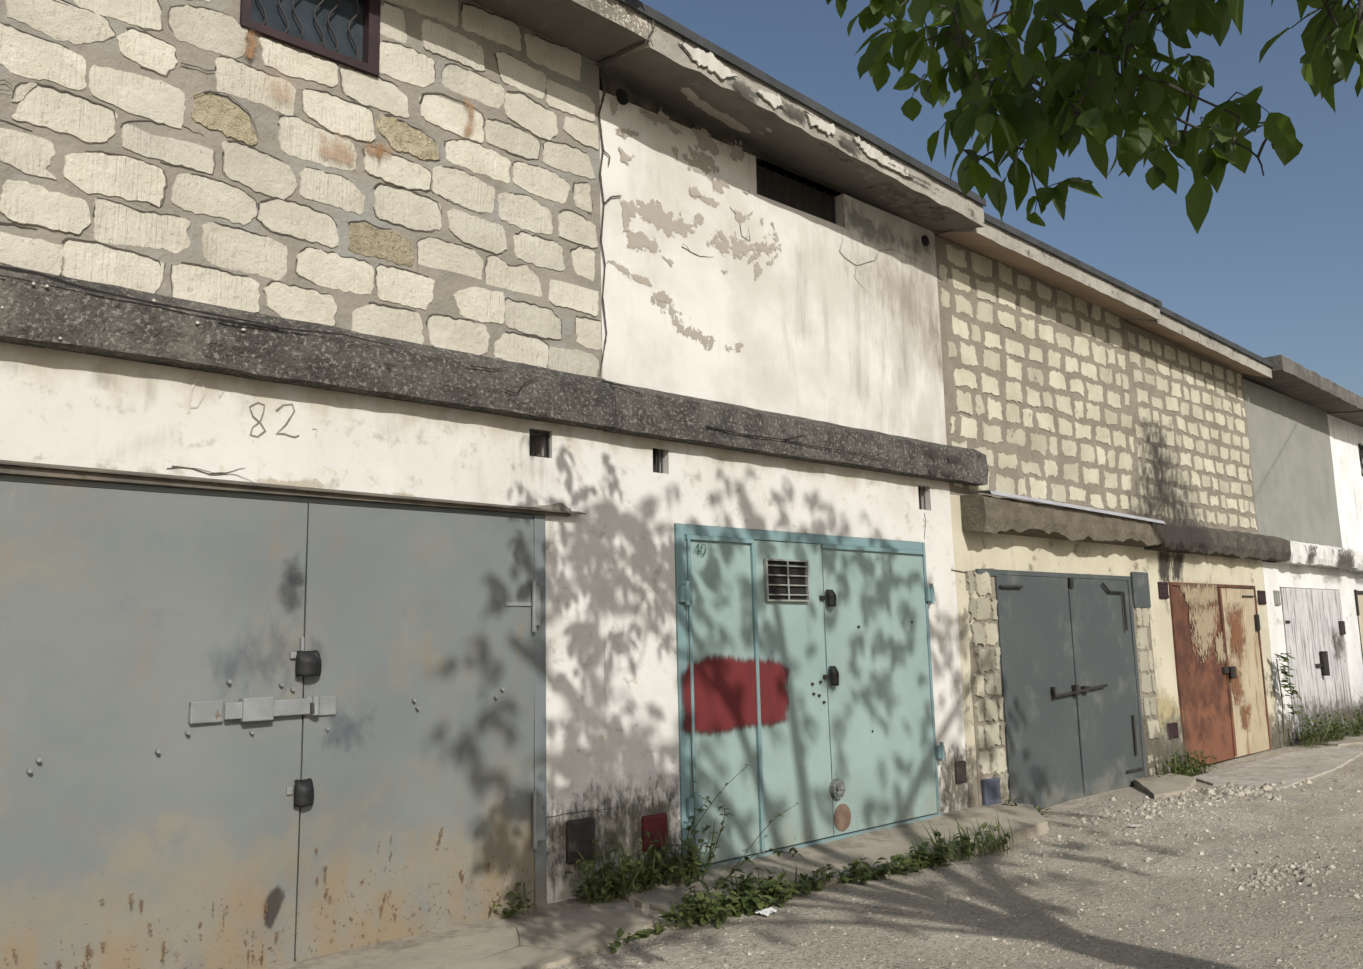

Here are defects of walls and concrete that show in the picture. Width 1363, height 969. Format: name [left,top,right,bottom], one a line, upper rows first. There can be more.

peeling [678,41,738,80]
peeling [611,96,639,164]
peeling [619,87,785,281]
spalling [804,111,952,222]
peeling [607,260,744,352]
crack [167,466,253,482]
water stain [1130,420,1215,582]
corrosion [1224,602,1252,732]
water stain [546,783,682,887]
corrosion [247,887,284,964]